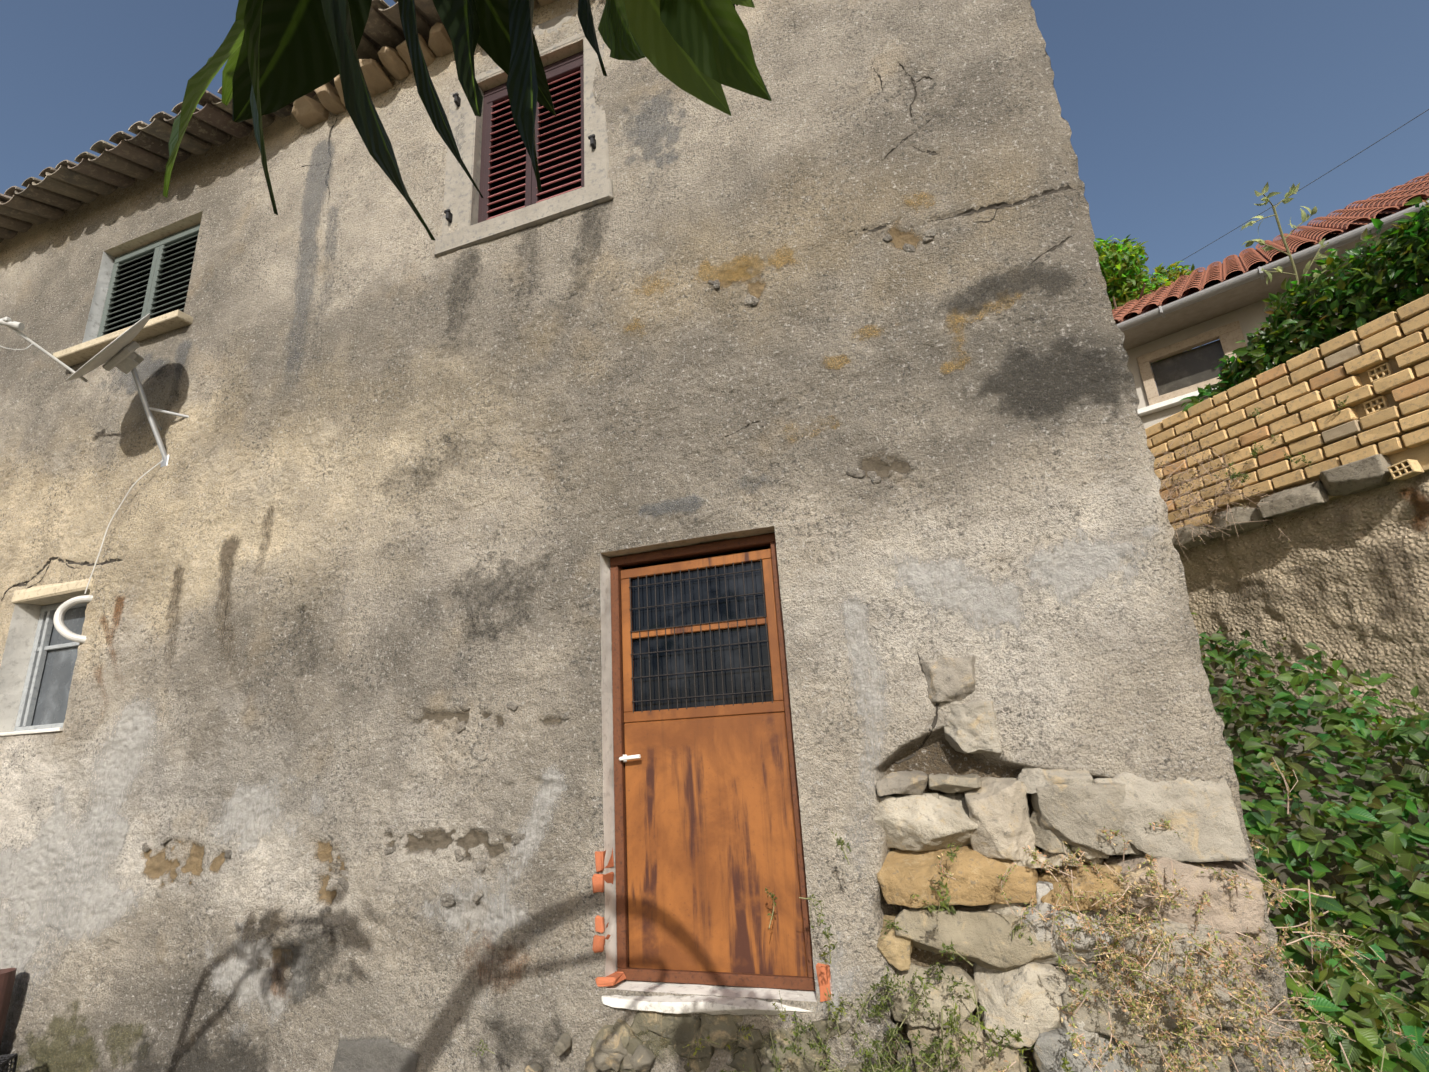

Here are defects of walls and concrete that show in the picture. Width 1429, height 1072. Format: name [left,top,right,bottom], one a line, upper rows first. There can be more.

crack [872,62,938,159]
crack [848,222,893,233]
crack [929,185,1076,222]
crack [1029,235,1074,265]
spalling [922,655,1002,754]
spalling [142,836,232,899]
spalling [873,767,1268,1072]
leakage [133,1026,264,1072]